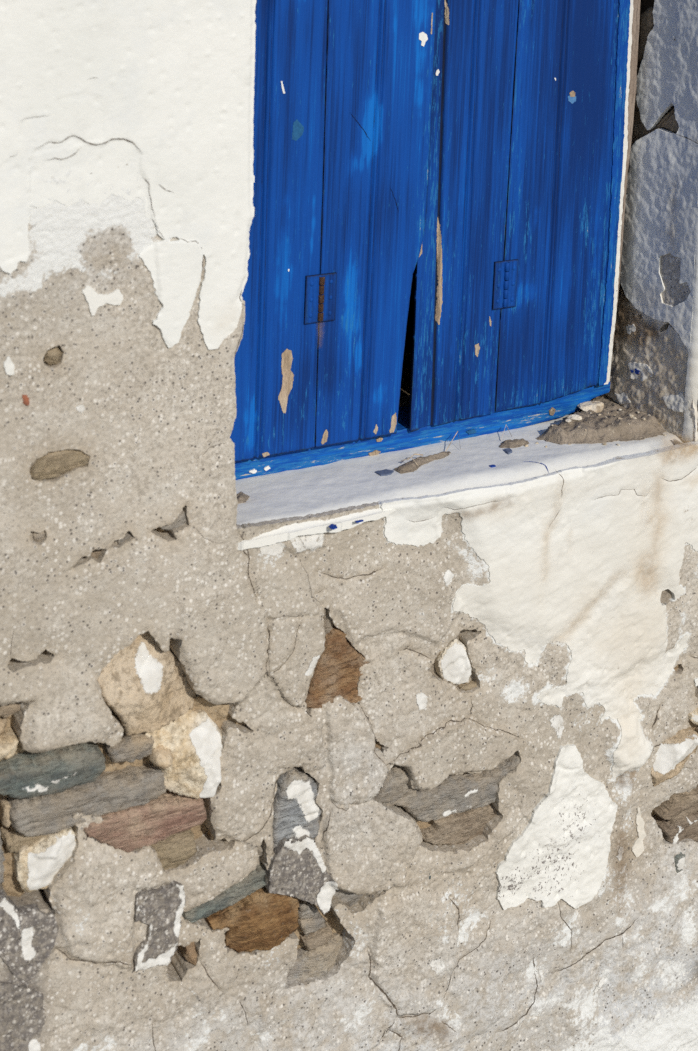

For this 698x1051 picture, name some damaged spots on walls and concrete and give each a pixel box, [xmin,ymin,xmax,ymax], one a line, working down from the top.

spalling [637,0,655,75]
spalling [631,94,679,147]
peeling [660,253,691,307]
spalling [492,302,698,486]
peeling [0,187,520,1051]
crack [266,563,382,708]
crack [359,701,524,764]
peeling [246,512,698,1051]
crack [369,900,492,1050]
crack [496,903,639,1033]